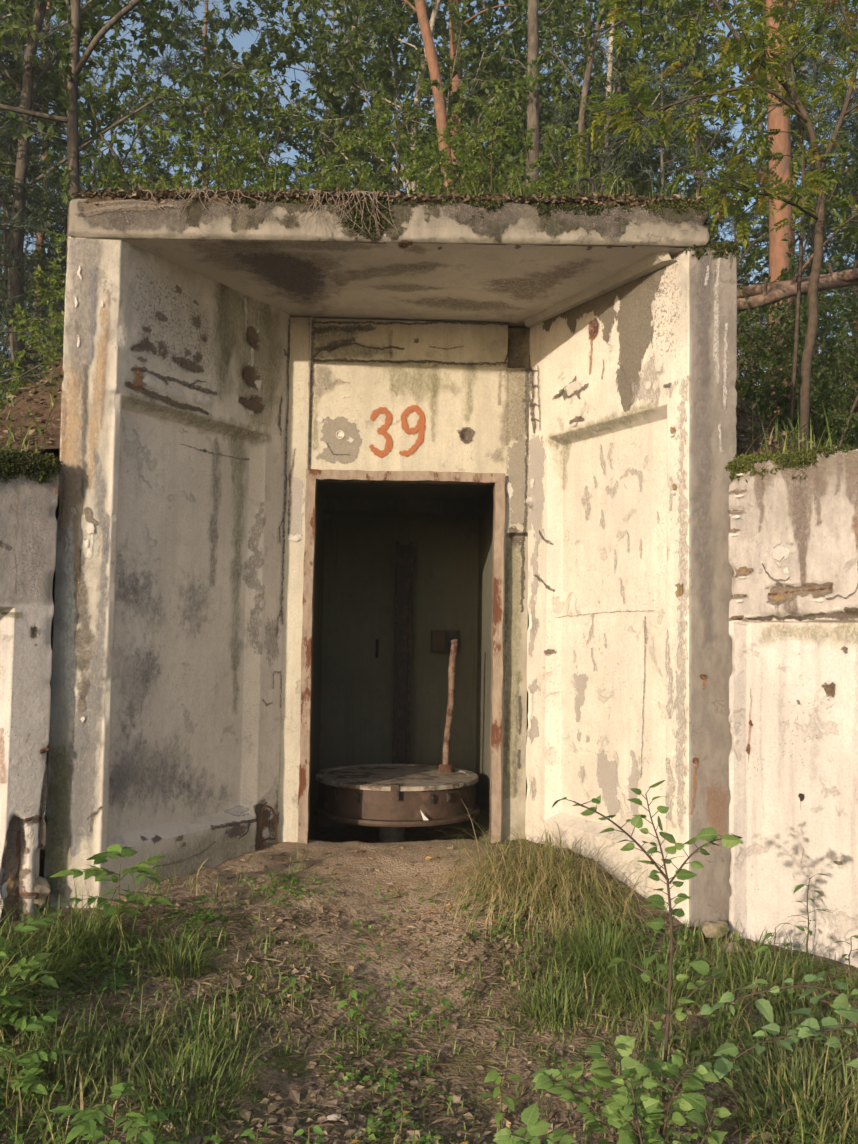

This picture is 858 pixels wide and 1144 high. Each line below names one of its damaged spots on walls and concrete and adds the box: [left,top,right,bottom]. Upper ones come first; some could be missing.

spalling [126,282,215,415]
spalling [239,326,265,415]
rust [588,318,599,375]
spalling [316,416,362,464]
leakage [61,198,273,856]
flaking render [542,258,692,821]
spalling [732,566,753,579]
spalling [727,580,858,625]
leakage [741,450,858,586]
spalling [0,747,50,927]